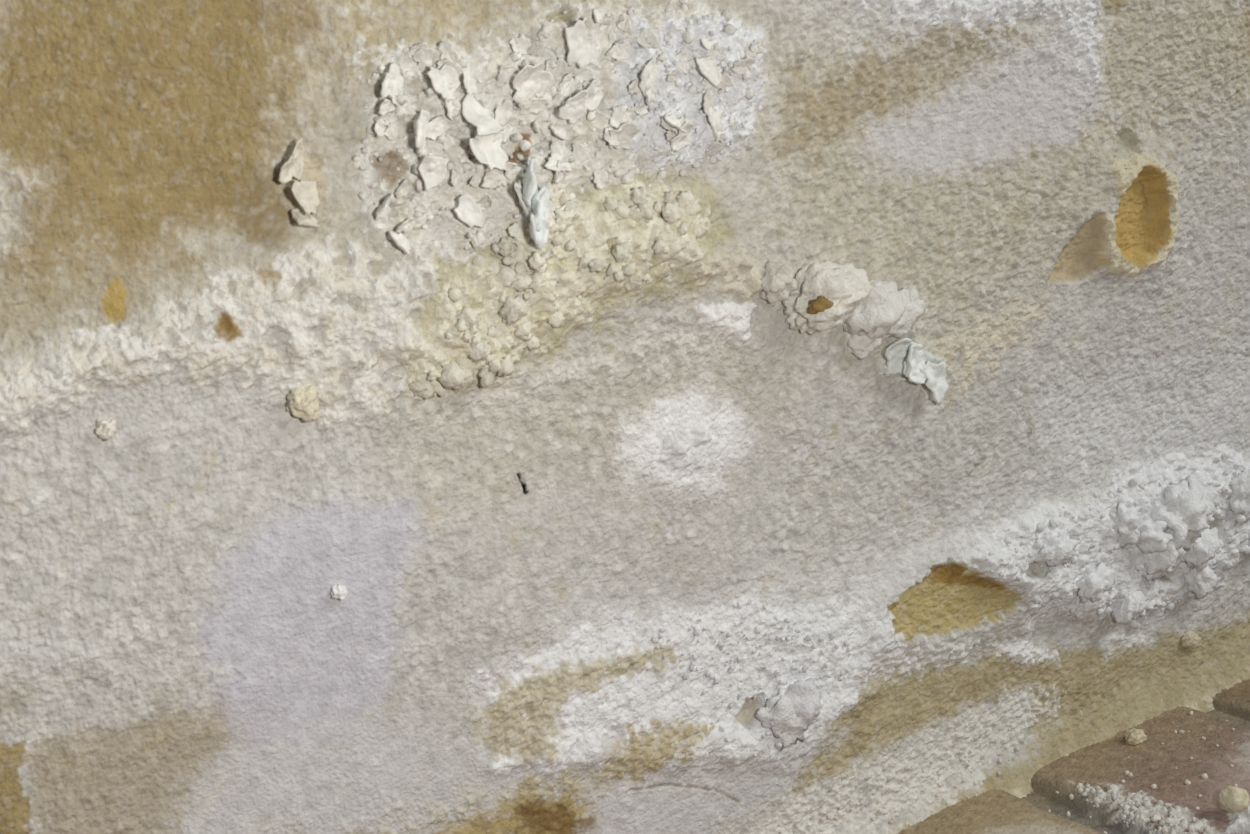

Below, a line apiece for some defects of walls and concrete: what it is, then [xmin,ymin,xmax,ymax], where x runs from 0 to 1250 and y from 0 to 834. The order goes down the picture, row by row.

peeling [274,0,773,281]
water stain [0,0,1134,517]
spalling [1046,129,1182,286]
water stain [0,670,202,834]
spalling [733,691,765,732]
water stain [284,432,1250,834]
spalling [887,558,1054,646]